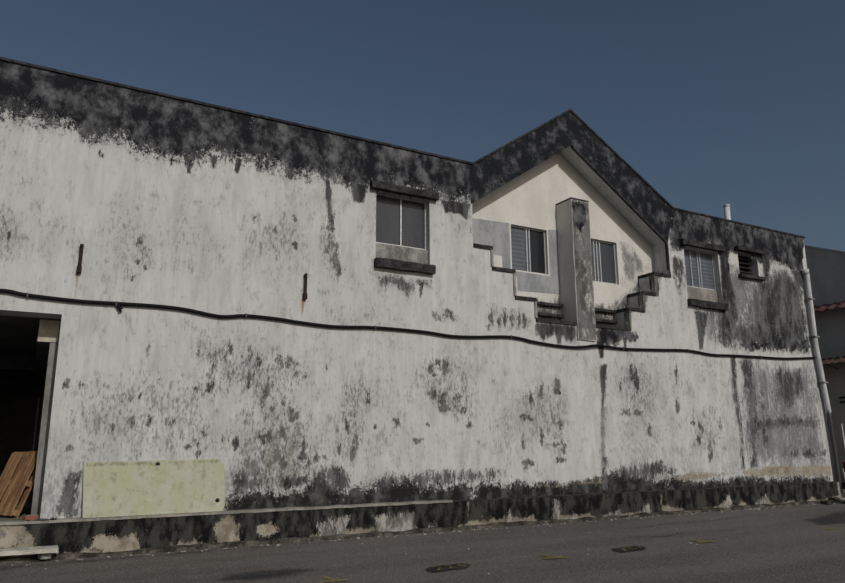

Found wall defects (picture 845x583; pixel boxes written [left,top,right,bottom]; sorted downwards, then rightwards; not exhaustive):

water stain [0,60,810,358]
water stain [20,357,839,554]